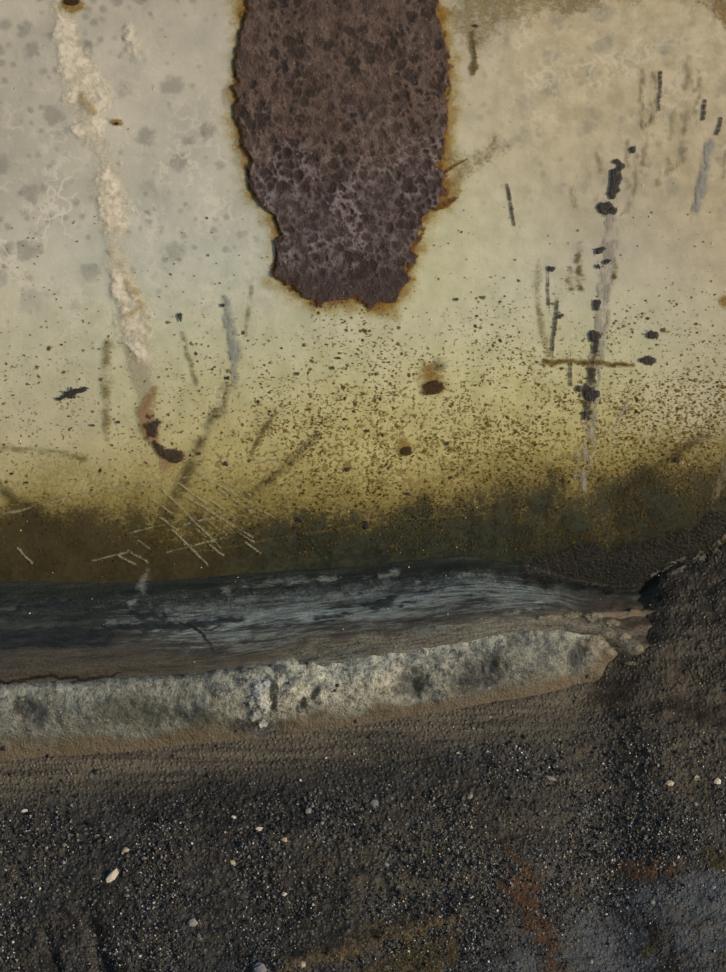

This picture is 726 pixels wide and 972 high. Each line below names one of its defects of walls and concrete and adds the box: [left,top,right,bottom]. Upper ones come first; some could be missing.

rust [32,0,726,565]